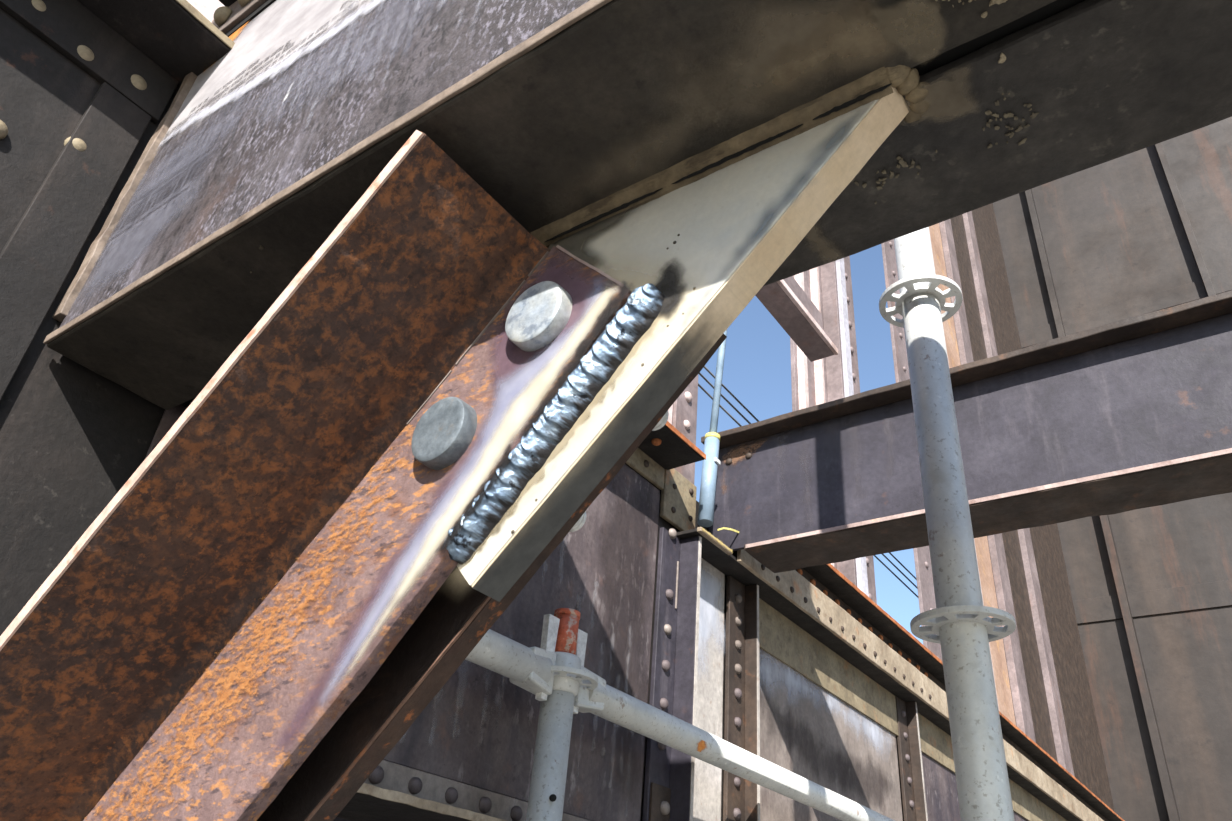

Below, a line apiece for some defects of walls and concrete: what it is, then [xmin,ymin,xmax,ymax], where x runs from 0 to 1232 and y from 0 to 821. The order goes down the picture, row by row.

peeling [982,92,1039,148]
corrosion [86,448,403,821]